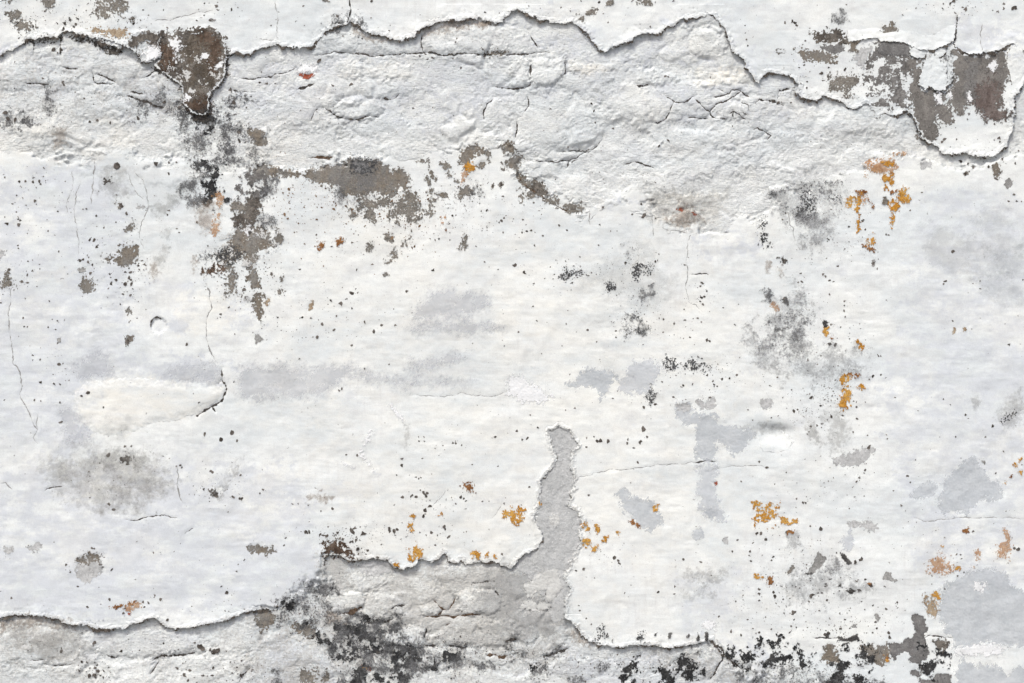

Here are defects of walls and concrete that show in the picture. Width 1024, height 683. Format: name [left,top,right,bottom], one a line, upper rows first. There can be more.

leakage [129,86,267,213]
crack [234,67,399,121]
crack [322,33,600,223]
spalling [0,0,1024,344]
crack [637,84,789,140]
rust [845,151,912,253]
peeling [674,396,756,462]
rust [837,372,866,411]
spalling [0,422,814,683]
rust [502,501,542,526]
rust [751,500,798,535]
peeling [857,567,1024,683]